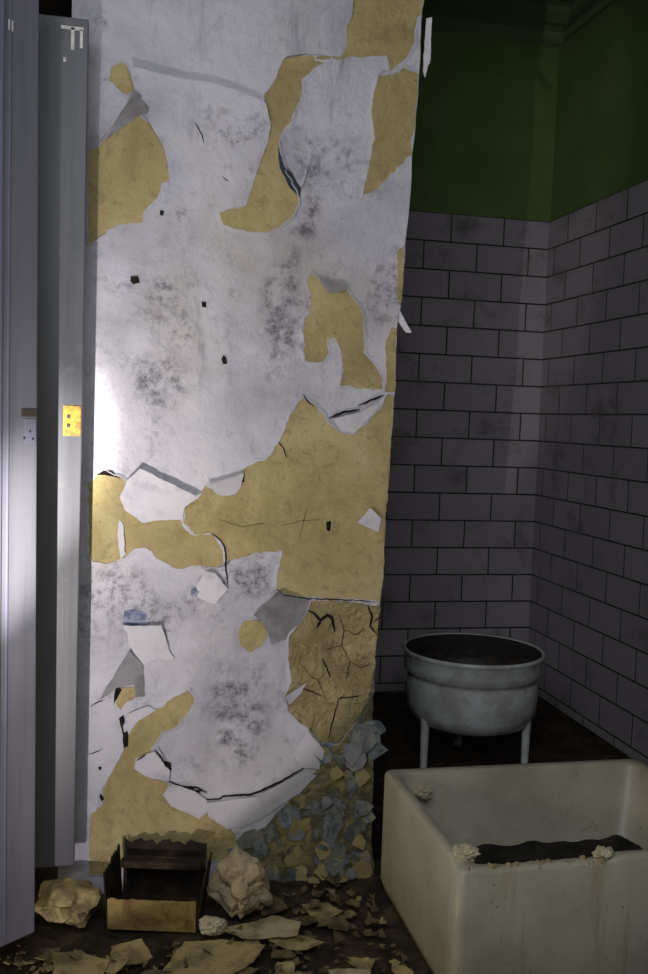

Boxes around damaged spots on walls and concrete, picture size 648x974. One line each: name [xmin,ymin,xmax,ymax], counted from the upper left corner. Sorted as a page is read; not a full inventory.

peeling [85,0,432,246]
peeling [83,246,412,881]
crack [276,589,380,738]